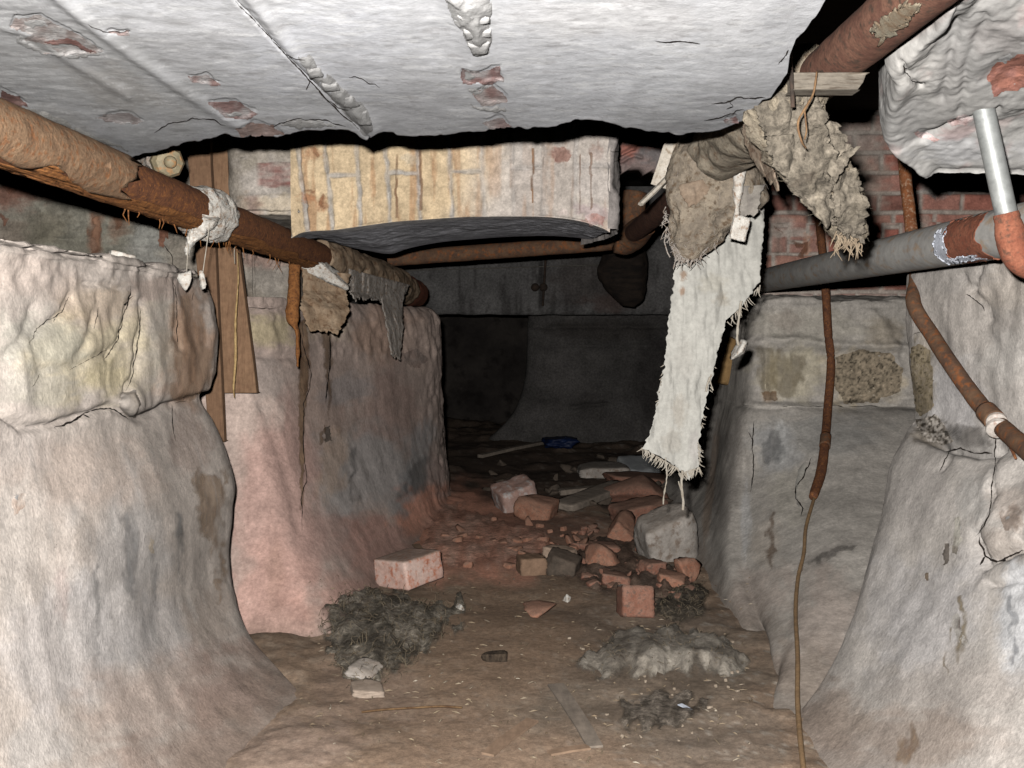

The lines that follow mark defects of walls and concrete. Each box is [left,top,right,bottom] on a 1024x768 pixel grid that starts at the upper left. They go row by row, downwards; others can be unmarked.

peeling [10,15,103,59]
peeling [987,54,1024,97]
crack [156,117,221,132]
peeling [208,101,336,137]
crack [54,289,141,428]
spalling [834,344,953,445]
crack [747,423,755,487]
crack [795,459,811,515]
crack [939,438,1024,565]